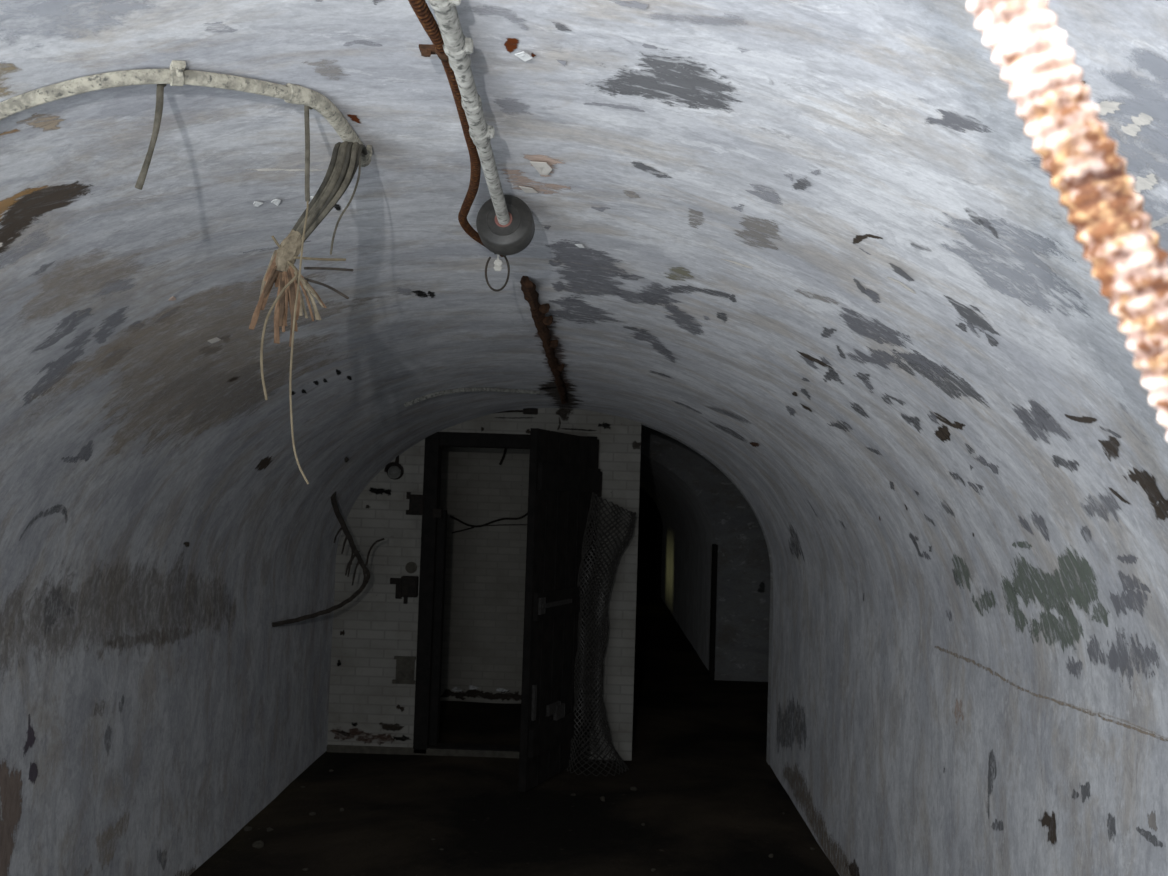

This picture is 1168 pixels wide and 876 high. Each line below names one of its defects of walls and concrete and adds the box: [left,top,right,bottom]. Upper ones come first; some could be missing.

water stain [0,63,18,95]
peeling [584,44,741,113]
peeling [926,109,992,132]
peeling [1095,48,1168,252]
peeling [0,181,91,267]
peeling [941,210,1093,319]
peeling [944,295,999,346]
spalling [1010,400,1121,473]
spalling [1123,467,1168,522]
peeling [952,488,1159,688]
crack [935,646,1168,741]
peeling [0,758,24,876]